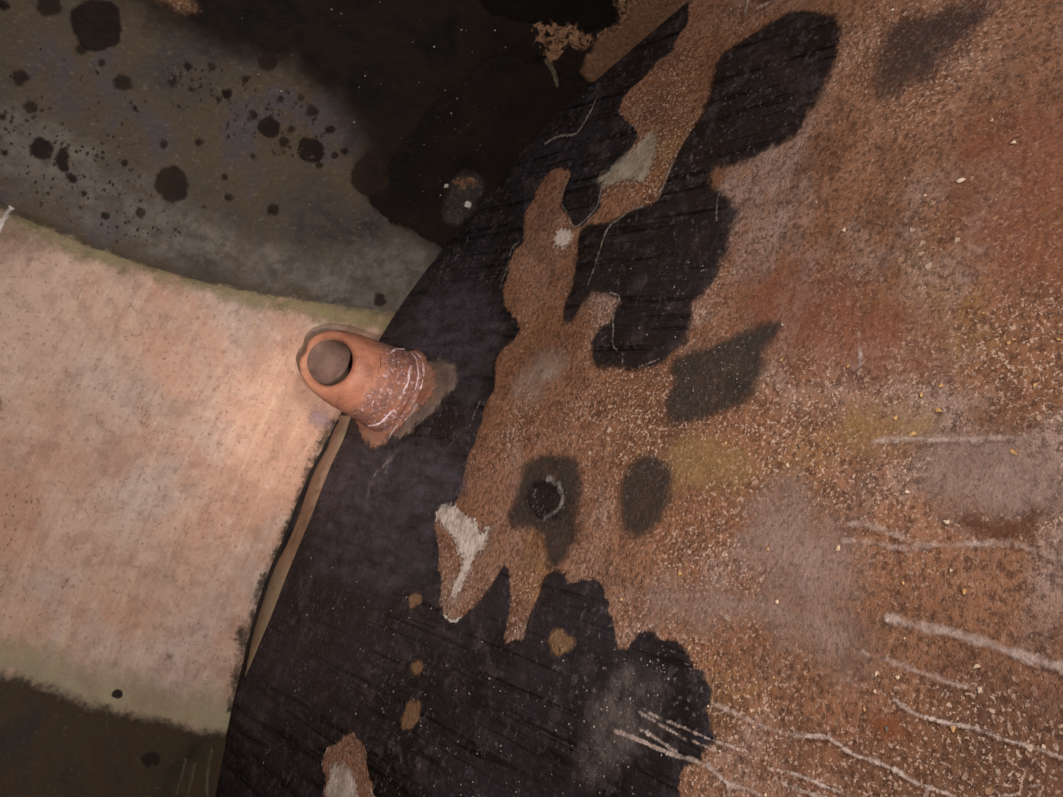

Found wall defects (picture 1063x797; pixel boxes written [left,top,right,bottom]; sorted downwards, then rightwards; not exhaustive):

flaking render [531,0,693,83]
water stain [0,0,497,393]
spalling [444,174,483,225]
rust [356,350,437,448]
water stain [272,405,335,560]
water stain [316,404,490,598]
water stain [236,572,267,653]
flaking render [408,593,422,609]
flaking render [548,628,576,656]
water stain [0,647,232,797]
flaking render [401,700,421,730]
flaking render [322,732,375,797]